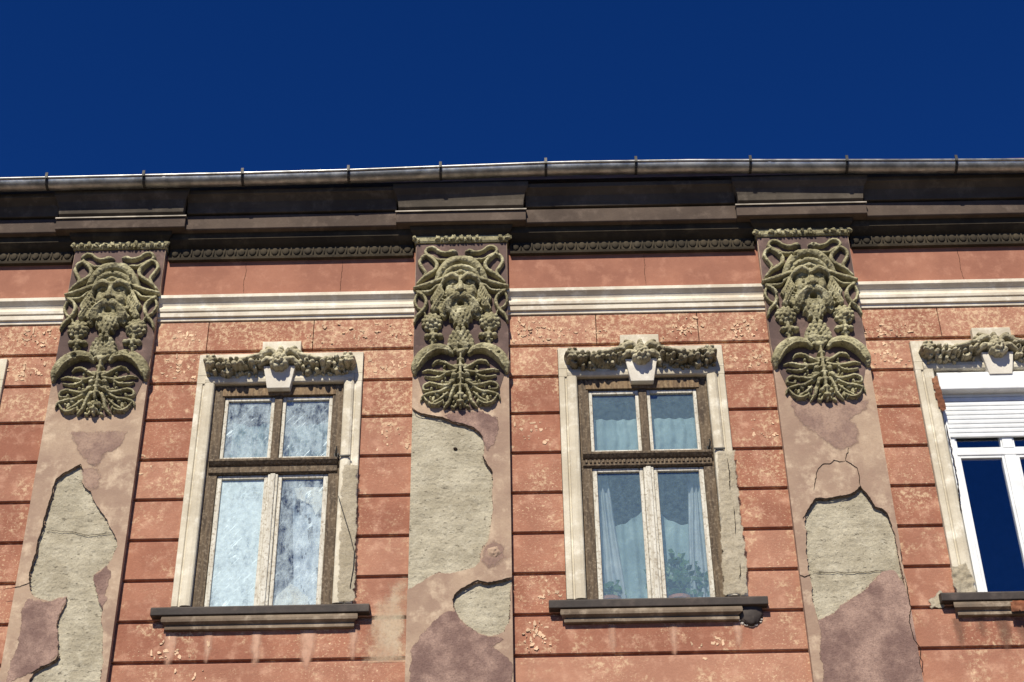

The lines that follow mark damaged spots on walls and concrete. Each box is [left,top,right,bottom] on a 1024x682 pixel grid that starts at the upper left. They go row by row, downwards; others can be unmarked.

flaking render [6,431,127,682]
flaking render [376,409,504,589]
peeling [409,579,521,682]
crack [803,452,892,525]
peeling [804,488,923,682]